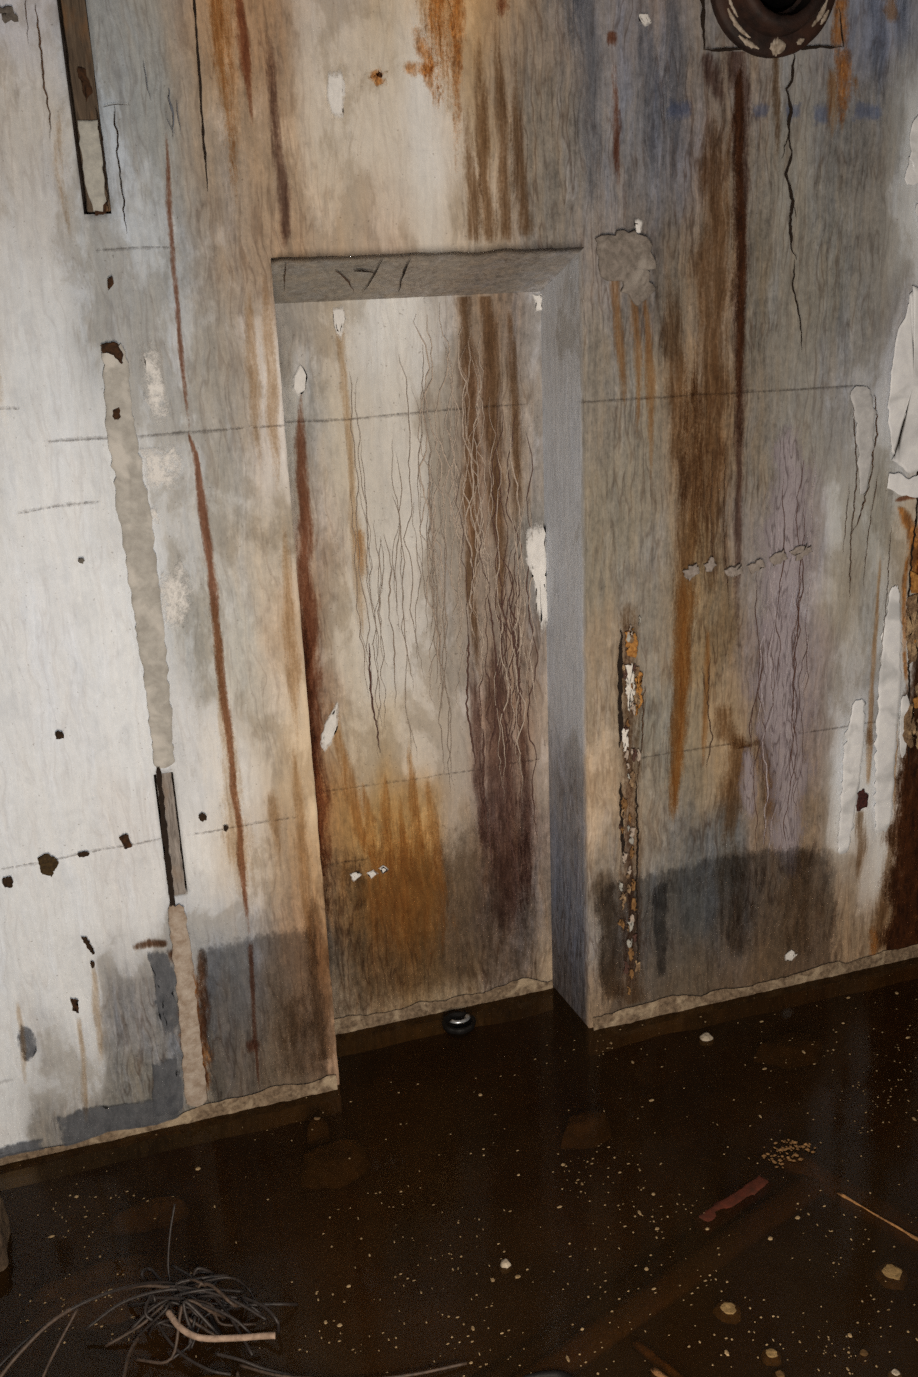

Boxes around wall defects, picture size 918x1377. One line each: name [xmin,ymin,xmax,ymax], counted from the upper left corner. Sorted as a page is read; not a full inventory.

crack [700,0,745,52]
corrosion [734,74,746,385]
crack [782,9,844,347]
peeling [905,116,918,185]
peeling [838,286,918,854]
spalling [617,616,646,995]
damp [593,944,918,1031]
corrosion [885,717,918,950]